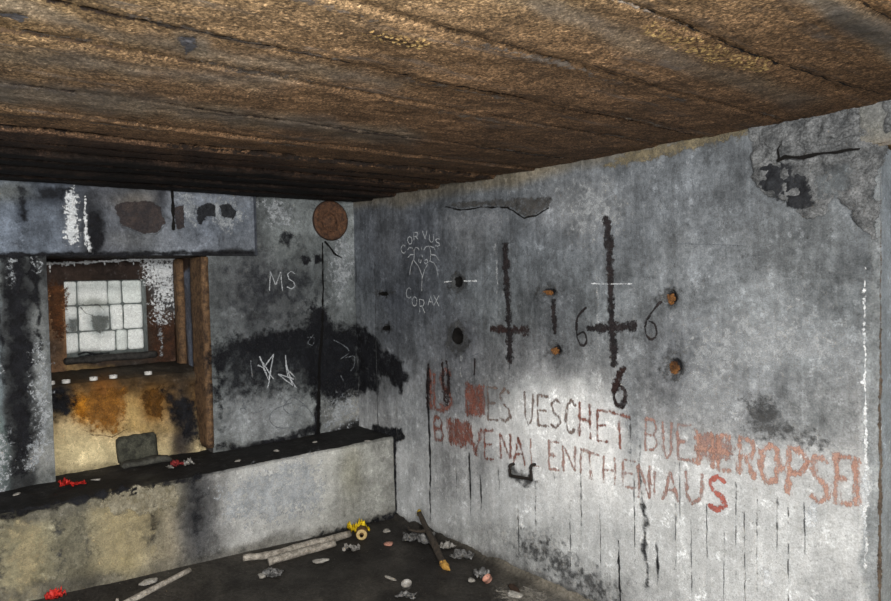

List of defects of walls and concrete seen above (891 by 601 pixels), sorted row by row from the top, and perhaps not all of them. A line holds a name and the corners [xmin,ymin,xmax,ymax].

crack [858,0,891,19]
crack [438,24,529,50]
crack [619,0,881,94]
flaking render [882,100,891,133]
flaking render [748,108,889,240]
water stain [25,185,175,470]
rust [70,386,127,435]
rust [142,388,165,420]